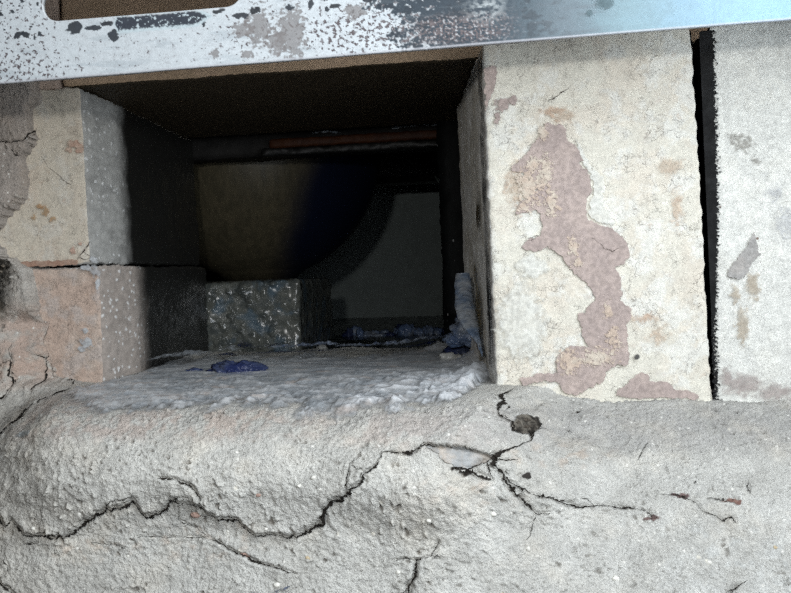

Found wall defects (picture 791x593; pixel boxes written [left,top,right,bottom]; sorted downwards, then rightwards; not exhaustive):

crack [0,130,37,156]
peeling [511,122,632,395]
crack [0,344,75,434]
peeling [616,372,699,401]
crack [0,444,436,574]
crack [451,389,652,539]
crack [662,493,737,524]
crack [396,541,439,593]